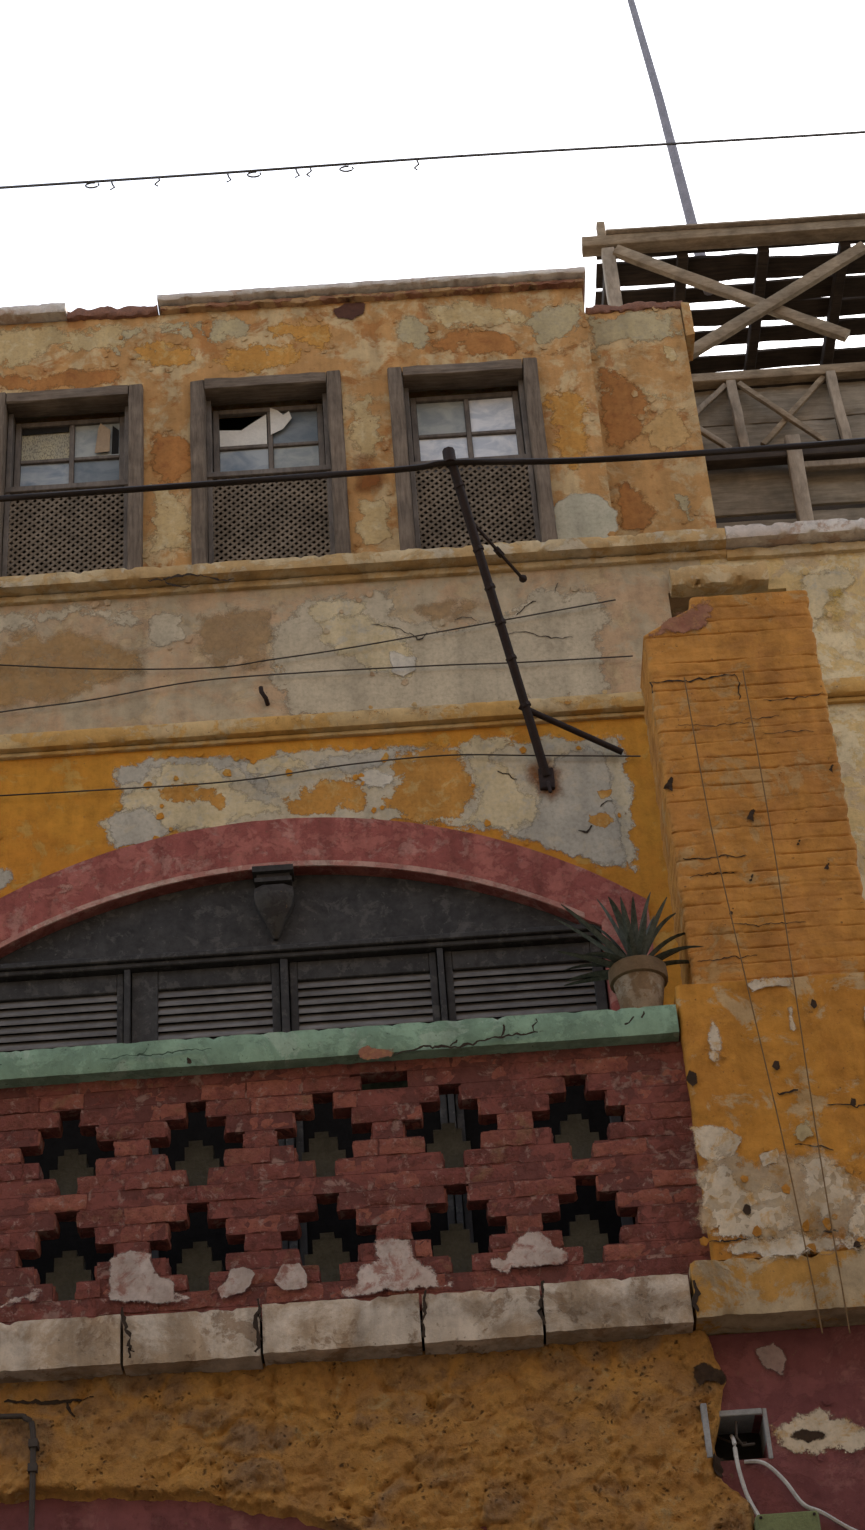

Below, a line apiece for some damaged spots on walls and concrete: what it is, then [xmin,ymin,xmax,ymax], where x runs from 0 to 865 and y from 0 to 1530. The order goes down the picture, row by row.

peeling [0,302,365,391]
peeling [393,300,693,470]
peeling [142,426,191,558]
flaking render [0,584,615,721]
crack [649,674,824,734]
flaking render [97,734,639,873]
crack [683,854,745,878]
crack [701,922,793,962]
peeling [690,1120,865,1258]
crack [253,1298,263,1352]
crack [537,1280,546,1325]
flaking render [771,1398,865,1462]